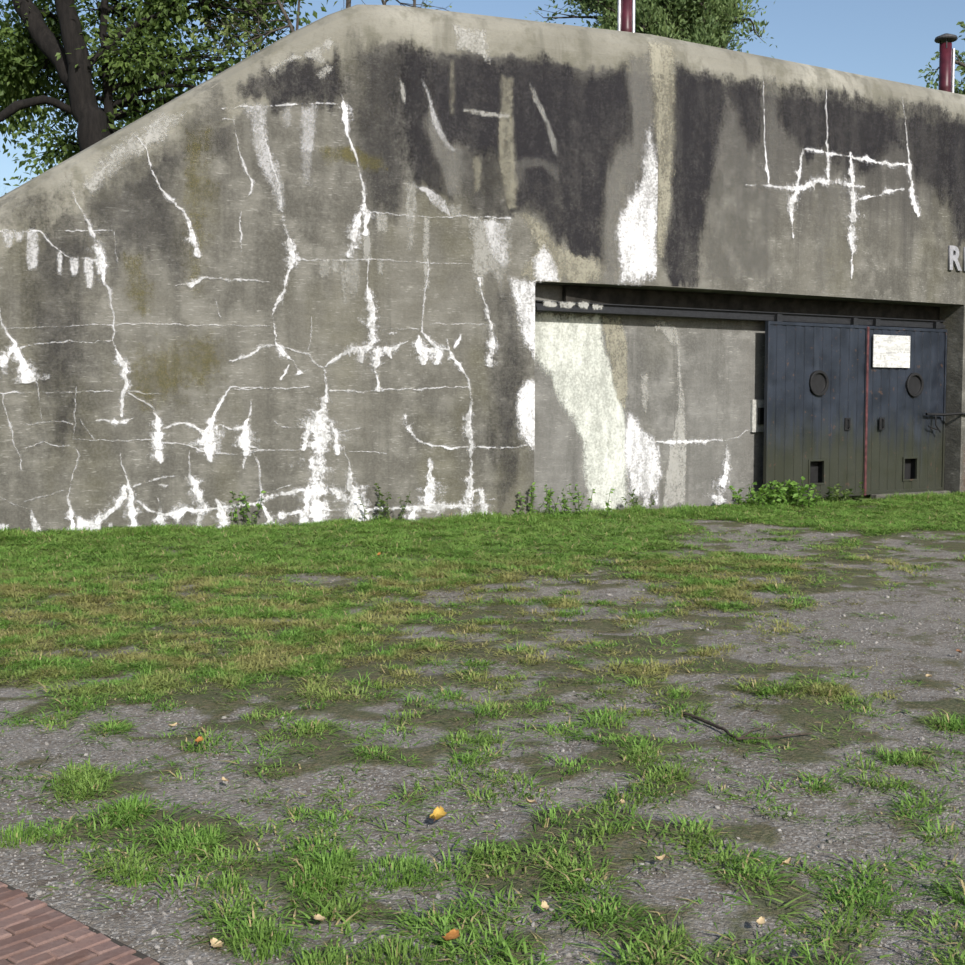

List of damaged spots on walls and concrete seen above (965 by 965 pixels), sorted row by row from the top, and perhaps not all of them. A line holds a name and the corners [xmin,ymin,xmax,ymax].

damp [241,54,342,114]
efflorescence [58,254,101,288]
crack [141,142,205,288]
crack [230,158,302,380]
crack [341,101,371,258]
damp [401,44,761,357]
crack [764,91,920,278]
damp [778,86,965,245]
crack [0,332,40,393]
crack [68,277,502,530]
efflorescence [624,342,686,508]
efflorescence [77,517,112,532]